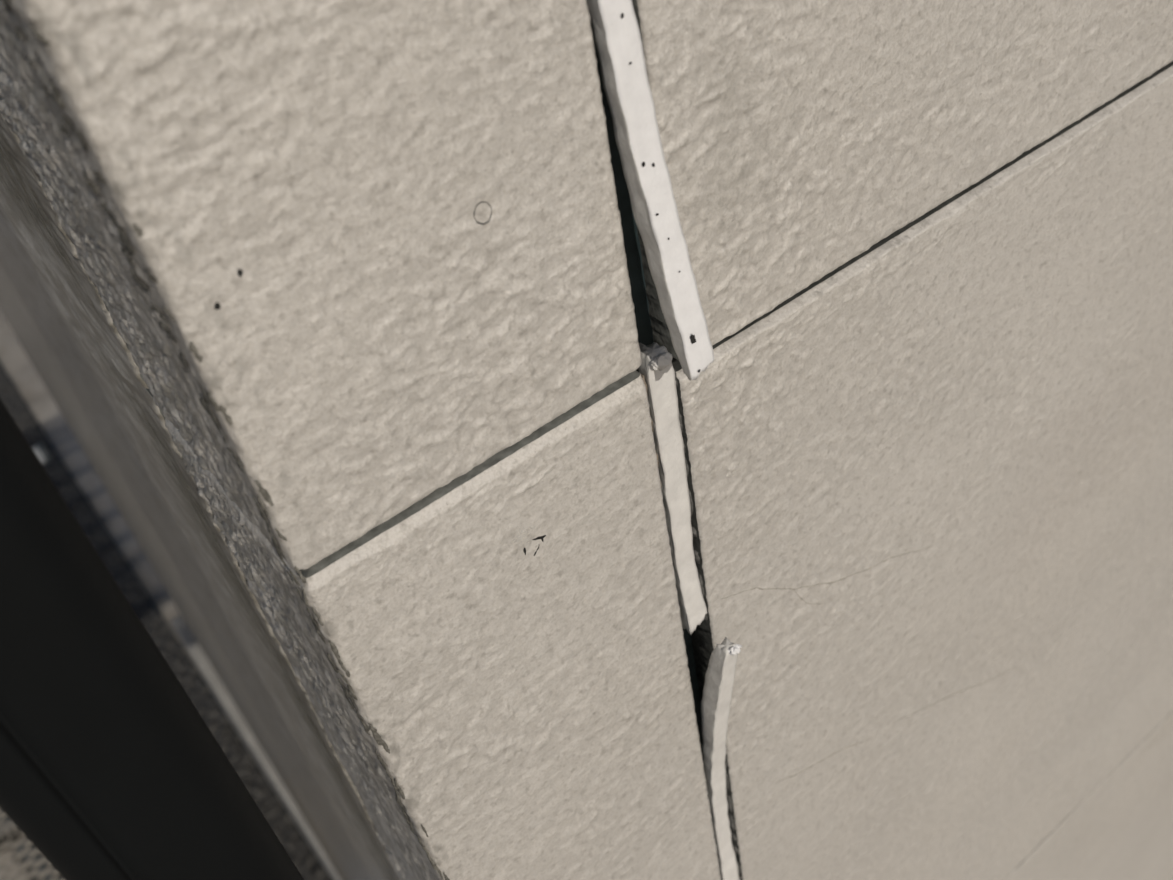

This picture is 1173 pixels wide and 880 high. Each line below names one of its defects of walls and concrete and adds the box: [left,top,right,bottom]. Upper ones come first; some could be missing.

peeling [587,0,714,635]
peeling [701,637,743,880]